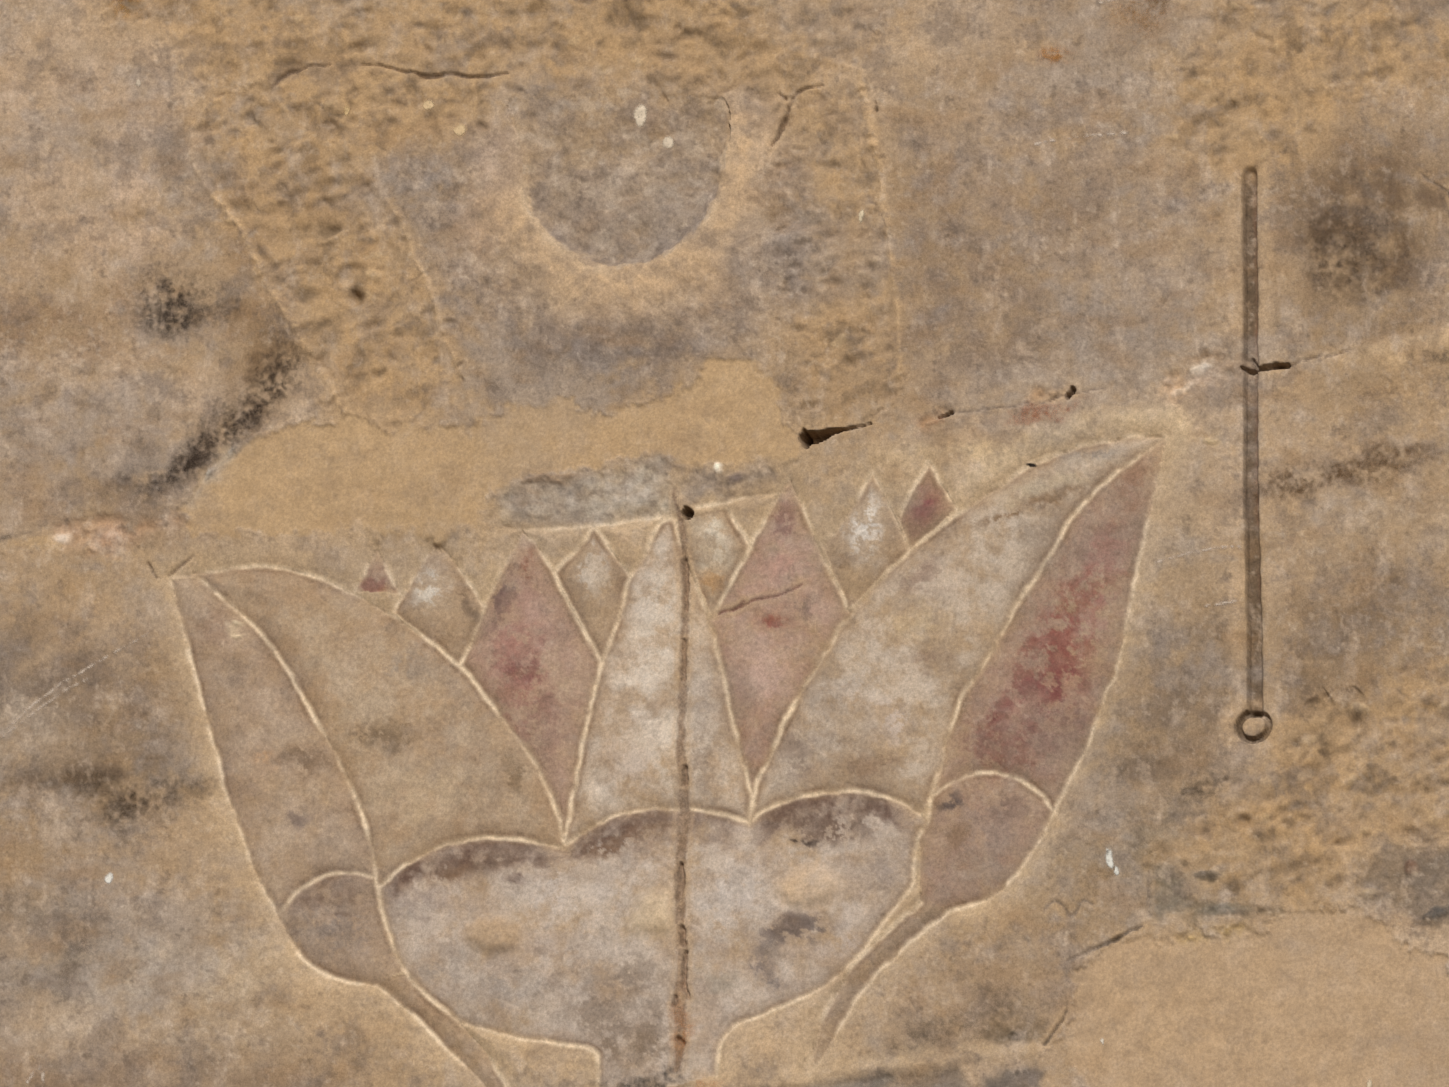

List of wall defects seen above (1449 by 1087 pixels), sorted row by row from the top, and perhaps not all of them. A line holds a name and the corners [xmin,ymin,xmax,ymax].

crack [272,64,510,89]
spalling [108,0,907,435]
crack [1241,349,1352,377]
crack [941,388,1108,419]
crack [801,425,871,449]
crack [672,489,804,1075]